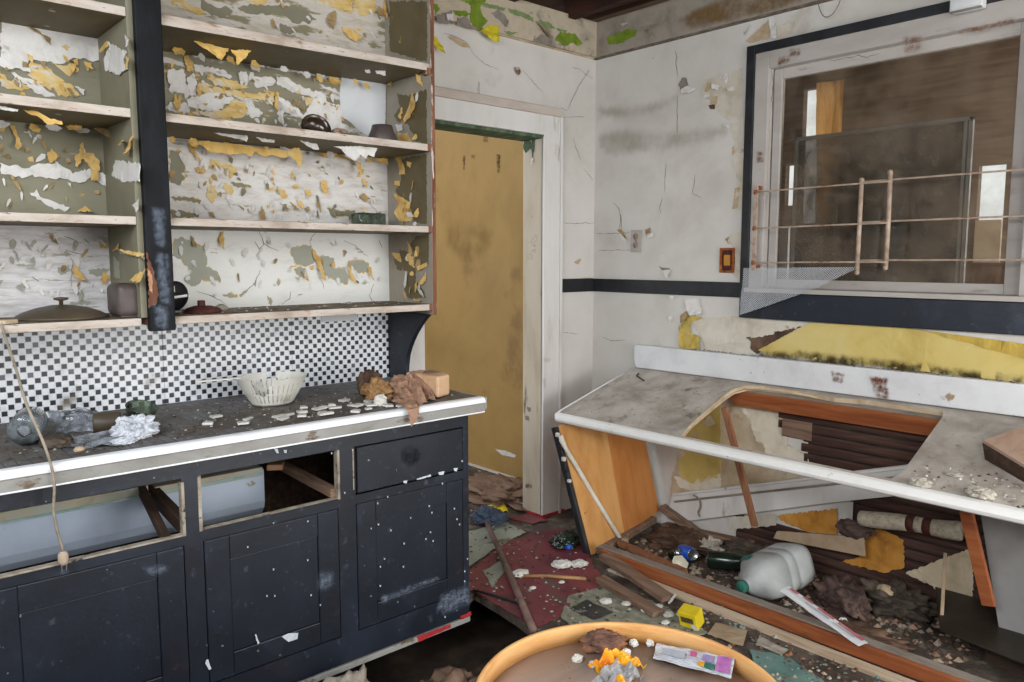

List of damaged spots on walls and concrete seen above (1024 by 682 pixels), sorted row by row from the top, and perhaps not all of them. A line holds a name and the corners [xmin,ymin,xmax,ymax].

peeling [0,22,129,98]
peeling [171,0,582,69]
peeling [0,106,141,212]
peeling [166,41,429,306]
peeling [678,68,745,212]
peeling [0,232,159,308]
peeling [685,405,721,444]
flaking render [668,296,1024,383]
leakage [760,353,996,380]
corrosion [871,377,888,398]
peeling [679,449,721,484]